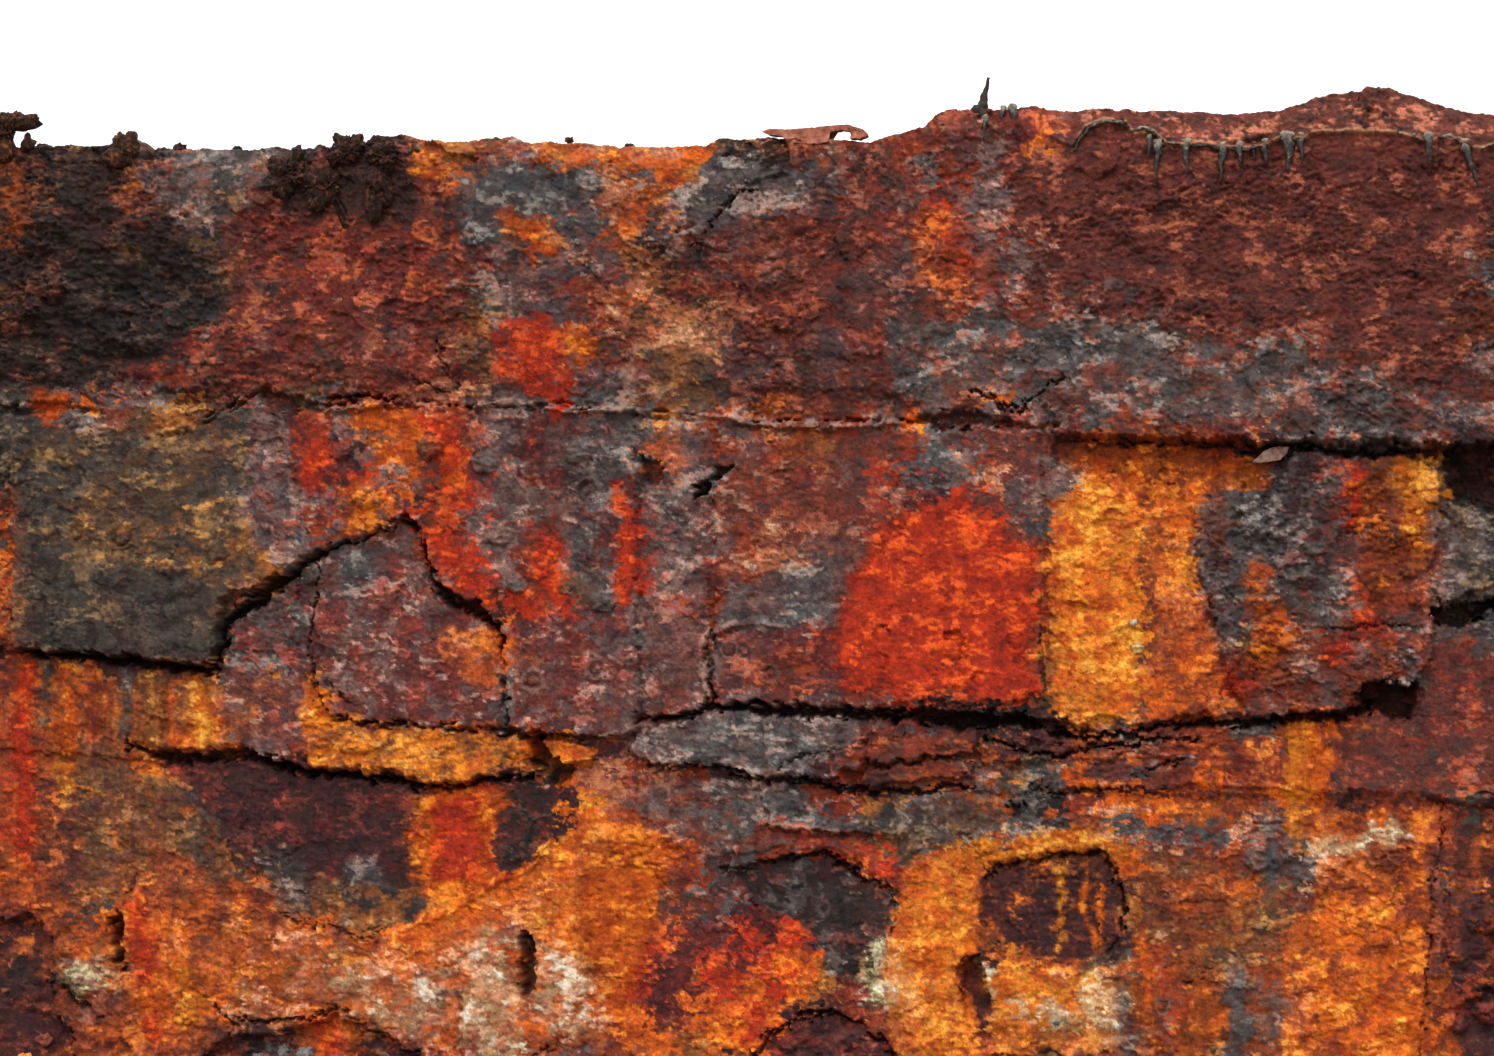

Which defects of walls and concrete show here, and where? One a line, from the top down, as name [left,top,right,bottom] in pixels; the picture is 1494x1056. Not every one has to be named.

spalling [0,912,77,1056]
corrosion [10,657,213,867]
crack [12,513,586,798]
spalling [204,1012,414,1056]
corrosion [354,401,561,614]
corrosion [405,781,510,907]
corrosion [576,813,666,1006]
corrosion [612,480,635,609]
corrosion [828,496,1041,699]
crack [631,628,1378,802]
corrosion [944,824,1130,951]
corrosion [1324,456,1430,665]